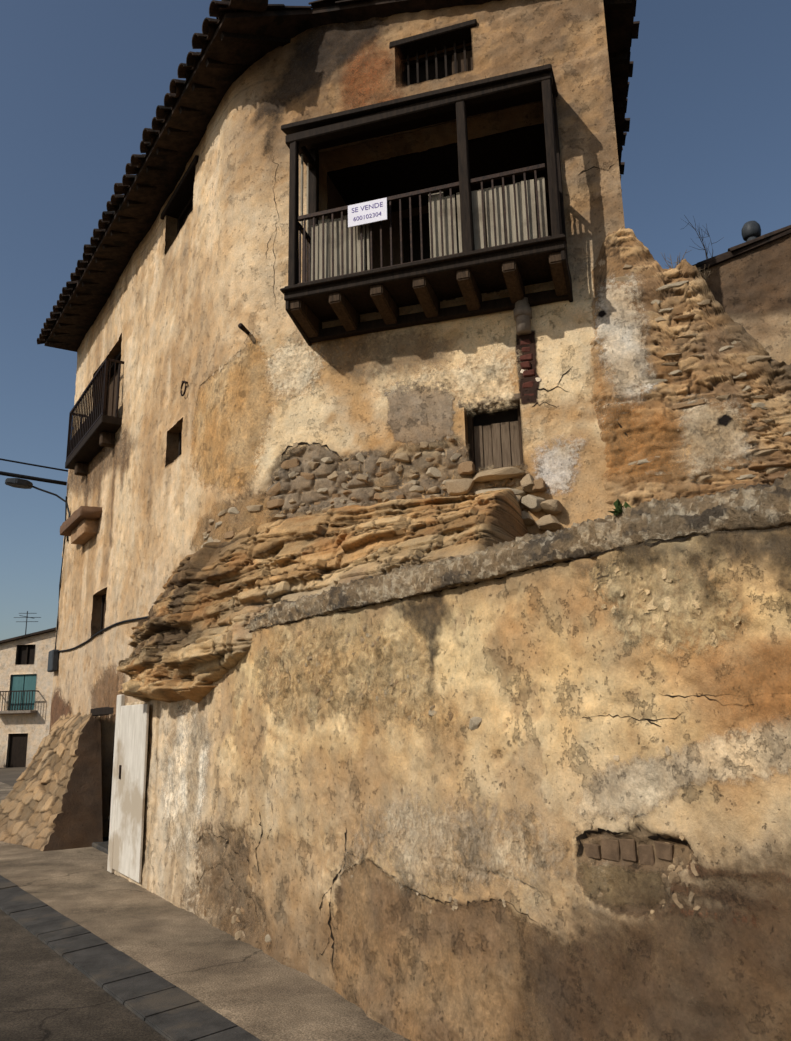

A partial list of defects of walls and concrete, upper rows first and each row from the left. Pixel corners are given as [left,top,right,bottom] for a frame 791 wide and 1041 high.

damp [255,17,385,149]
spalling [281,442,368,476]
crack [532,368,571,407]
damp [592,366,685,482]
damp [584,525,791,590]
crack [582,692,790,727]
crack [319,831,356,959]
spalling [574,813,702,914]
damp [514,851,791,1041]